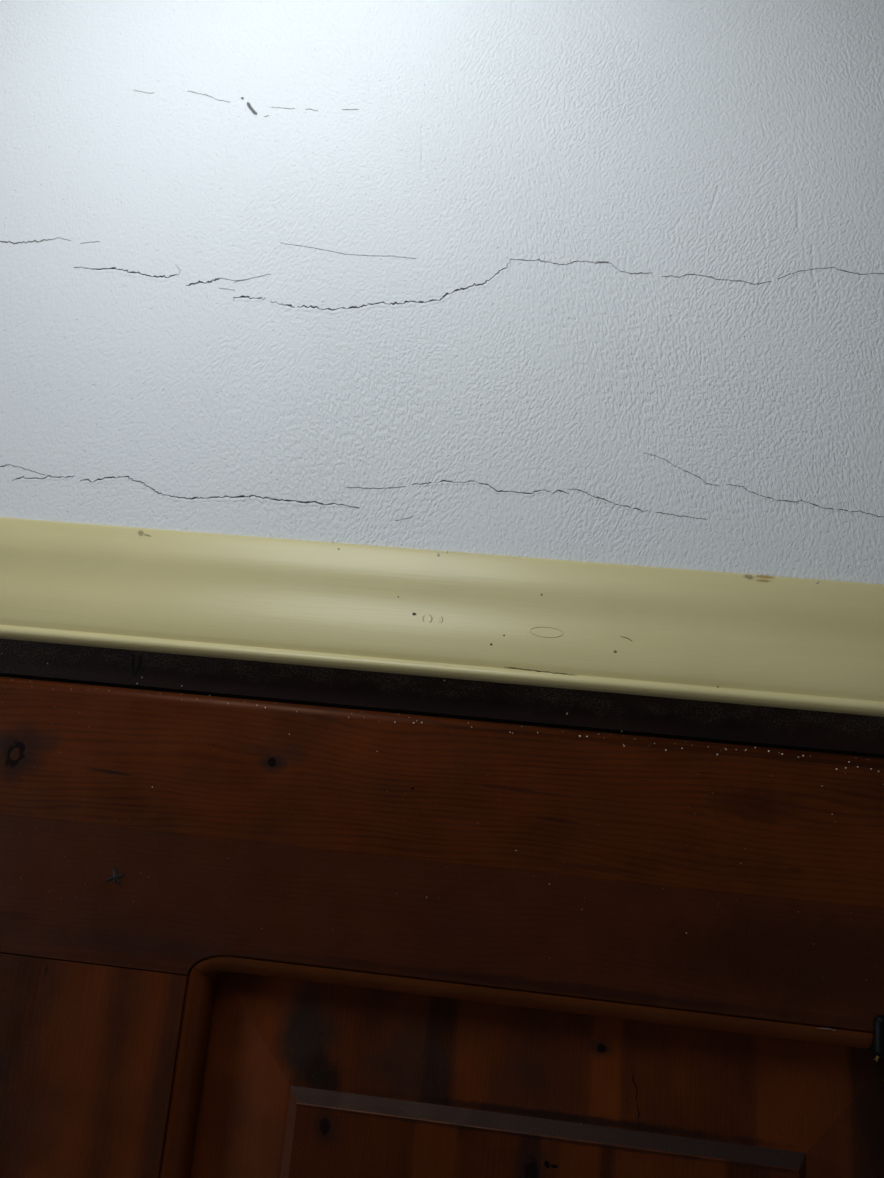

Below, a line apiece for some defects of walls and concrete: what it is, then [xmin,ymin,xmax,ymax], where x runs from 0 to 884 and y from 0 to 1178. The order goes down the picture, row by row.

crack [0,237,884,314]
crack [0,464,703,519]
crack [647,453,884,518]